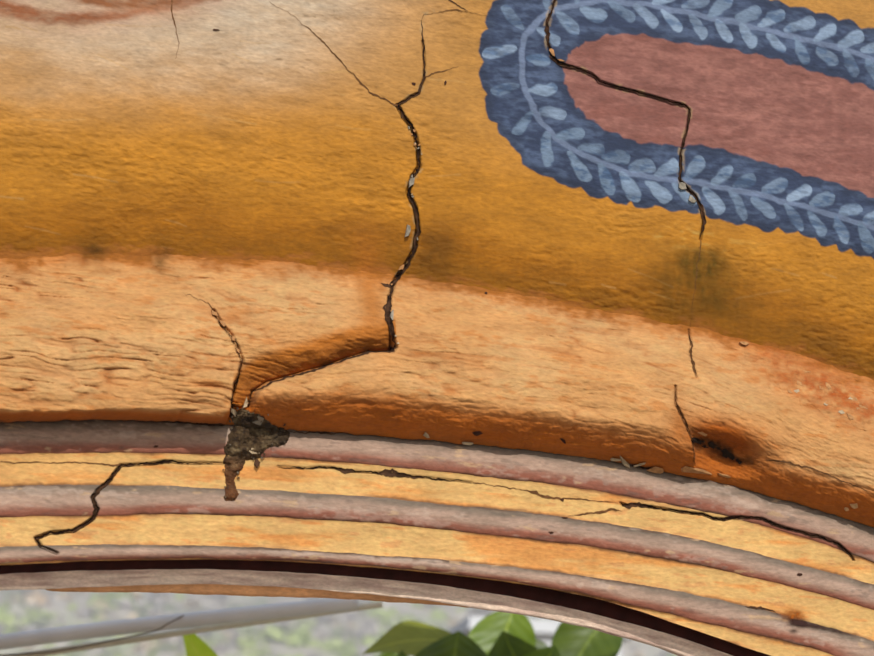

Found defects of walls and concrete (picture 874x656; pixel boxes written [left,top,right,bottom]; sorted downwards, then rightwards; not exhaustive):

crack [164,0,488,426]
crack [544,0,707,376]
spalling [222,397,290,501]
crack [675,387,695,463]
crack [0,460,223,551]
crack [280,466,874,563]